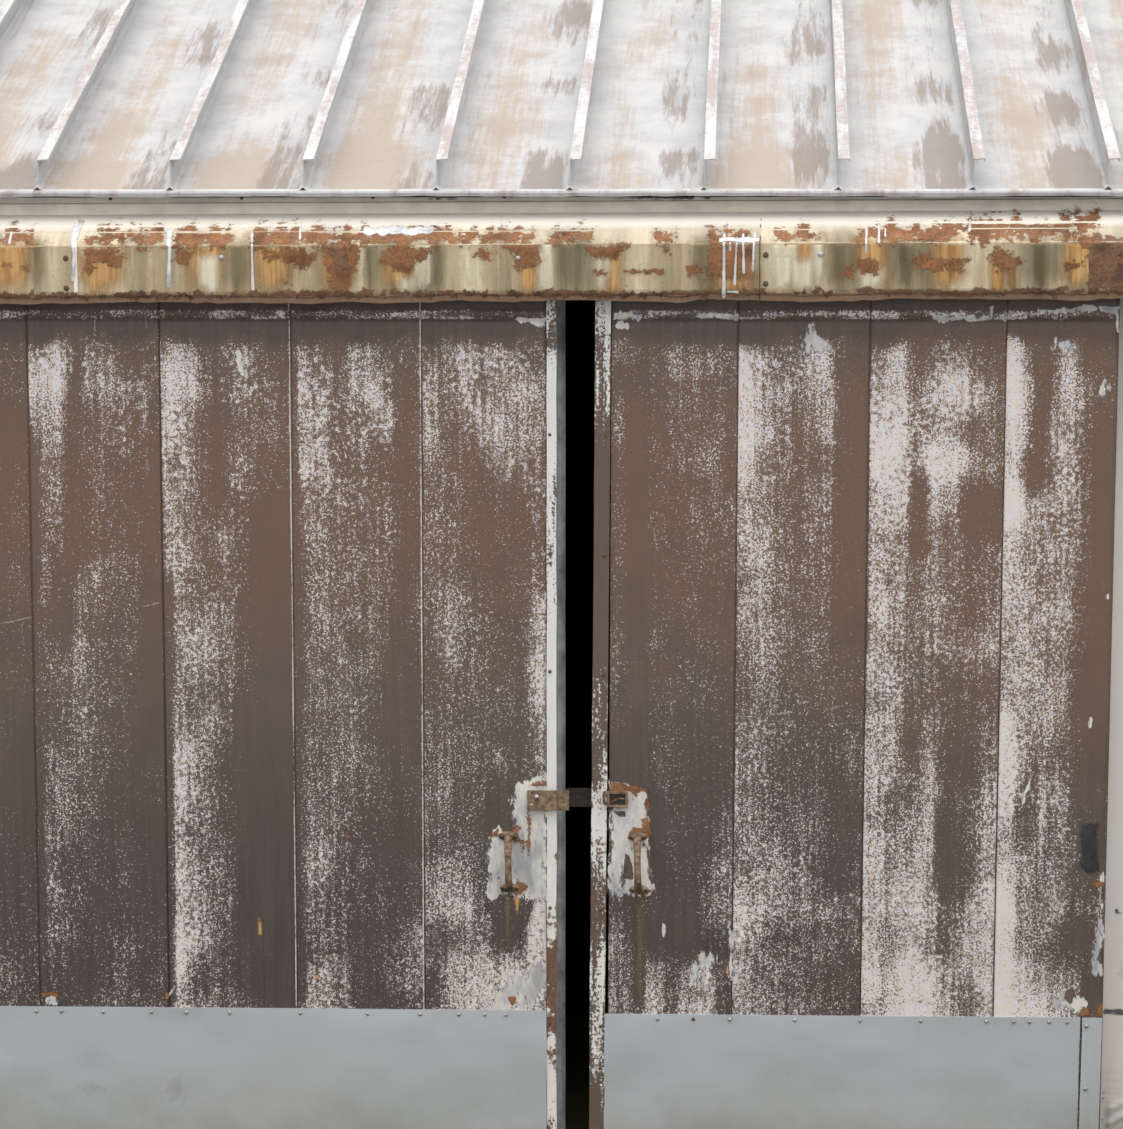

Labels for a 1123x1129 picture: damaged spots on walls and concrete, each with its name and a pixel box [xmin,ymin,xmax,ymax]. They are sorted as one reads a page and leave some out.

corrosion [0,218,766,301]
corrosion [774,223,833,298]
corrosion [839,206,1123,300]
peeling [613,310,642,330]
peeling [695,312,739,322]
peeling [798,322,832,354]
peeling [1037,304,1120,332]
peeling [485,772,547,912]
peeling [607,781,655,898]
peeling [1091,872,1121,977]
peeling [686,930,735,995]
peeling [1052,988,1103,1018]